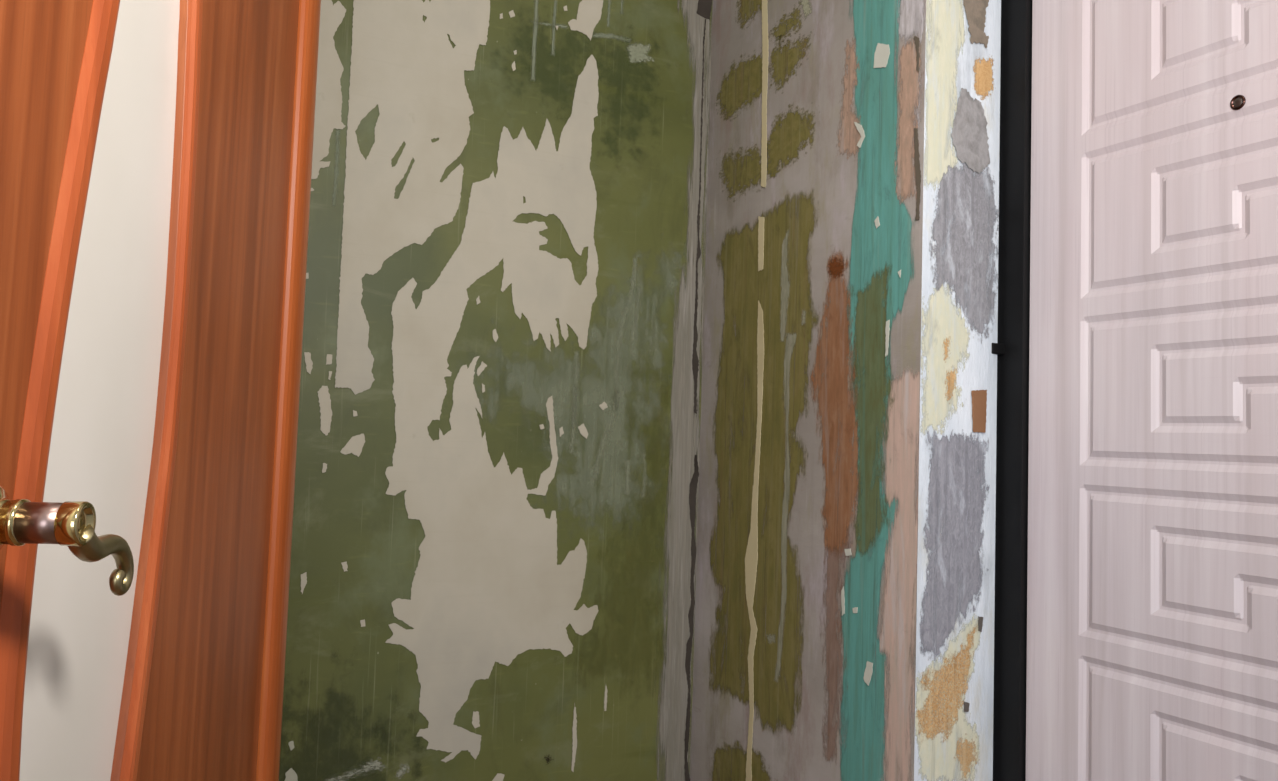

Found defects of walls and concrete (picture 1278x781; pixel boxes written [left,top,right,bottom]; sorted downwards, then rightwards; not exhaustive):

peeling [555,0,603,41]
spalling [963,0,989,48]
peeling [874,43,890,68]
peeling [311,0,346,191]
peeling [854,122,865,148]
spalling [951,88,990,174]
peeling [304,352,332,435]
peeling [559,423,588,439]
peeling [340,434,365,457]
peeling [863,661,873,686]
peeling [472,711,480,728]
peeling [284,768,298,781]